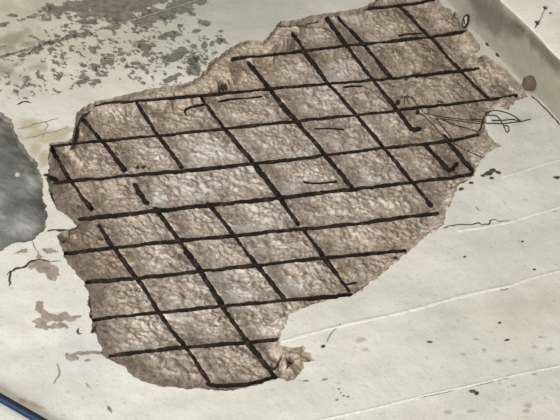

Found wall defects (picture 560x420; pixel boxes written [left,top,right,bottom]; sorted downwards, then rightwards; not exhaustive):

peeling [0,0,227,90]
peeling [0,69,61,99]
spalling [44,0,524,391]
crack [444,206,509,228]
crack [7,243,55,286]
peeling [32,301,81,330]